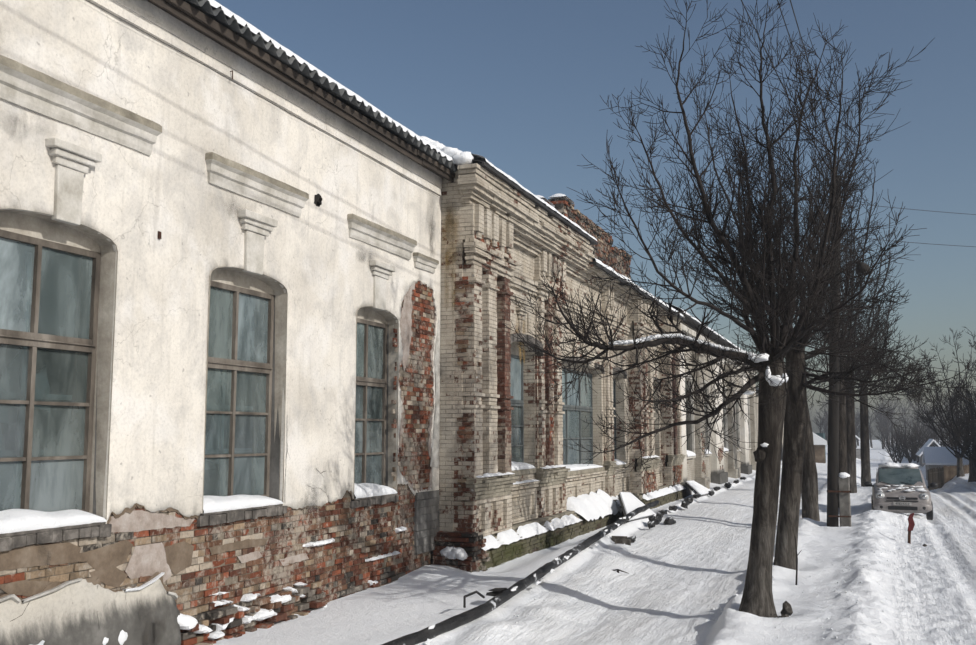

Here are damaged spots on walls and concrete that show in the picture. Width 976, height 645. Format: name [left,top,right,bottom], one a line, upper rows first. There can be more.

spalling [0,274,491,645]
peeling [643,469,657,494]
peeling [673,465,682,485]